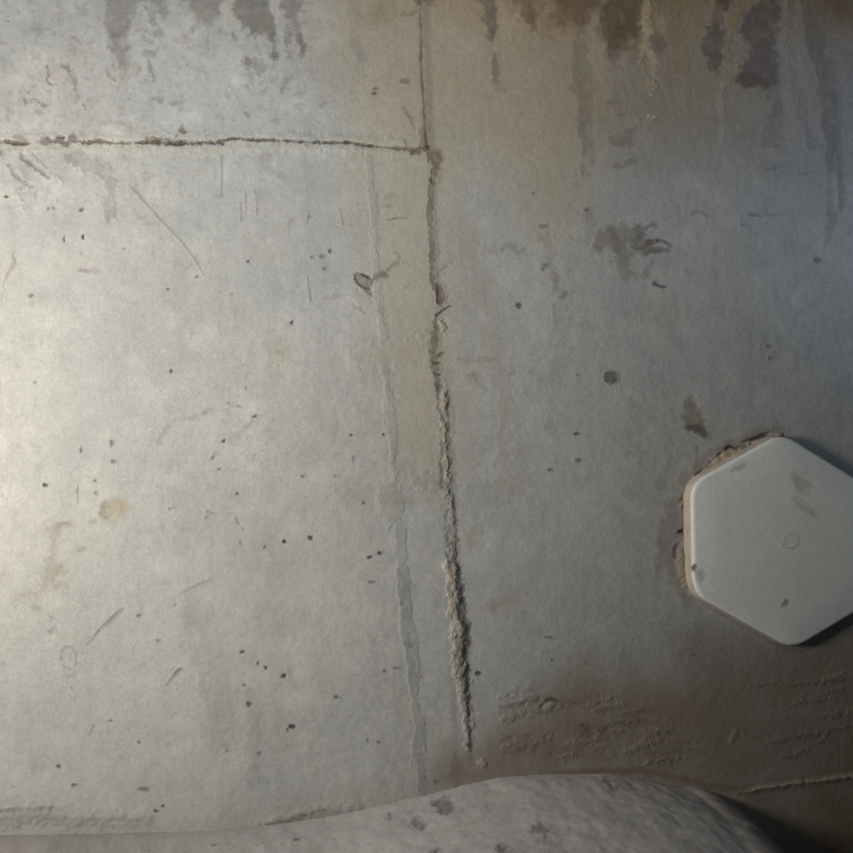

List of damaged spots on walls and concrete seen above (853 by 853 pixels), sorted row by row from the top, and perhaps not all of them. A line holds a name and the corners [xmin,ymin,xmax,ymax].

leakage [97,0,311,109]
leakage [576,204,674,290]
leakage [471,0,848,249]
crack [0,0,487,769]